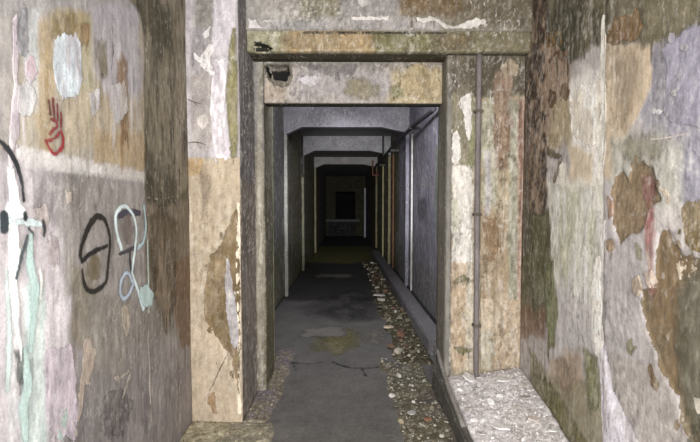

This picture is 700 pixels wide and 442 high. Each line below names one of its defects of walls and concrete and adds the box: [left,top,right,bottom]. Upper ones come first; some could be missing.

spalling [264,62,323,88]
flaking render [500,0,642,216]
flaking render [204,203,242,414]
crack [290,361,379,376]
damp [530,186,599,360]
flaking render [591,155,700,442]